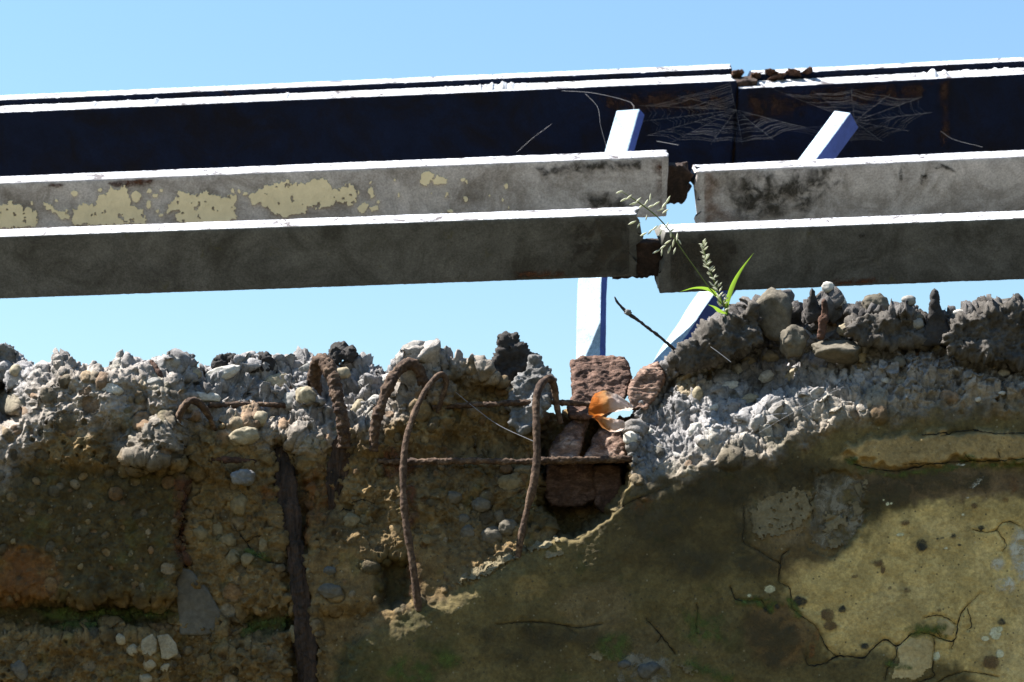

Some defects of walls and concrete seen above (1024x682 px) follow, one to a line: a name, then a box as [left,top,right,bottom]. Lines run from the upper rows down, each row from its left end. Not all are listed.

peeling [0,178,380,229]
spalling [175,397,286,431]
spalling [306,353,351,448]
rust [325,434,352,510]
spalling [368,357,640,612]
crack [854,429,1024,472]
crack [730,506,997,682]